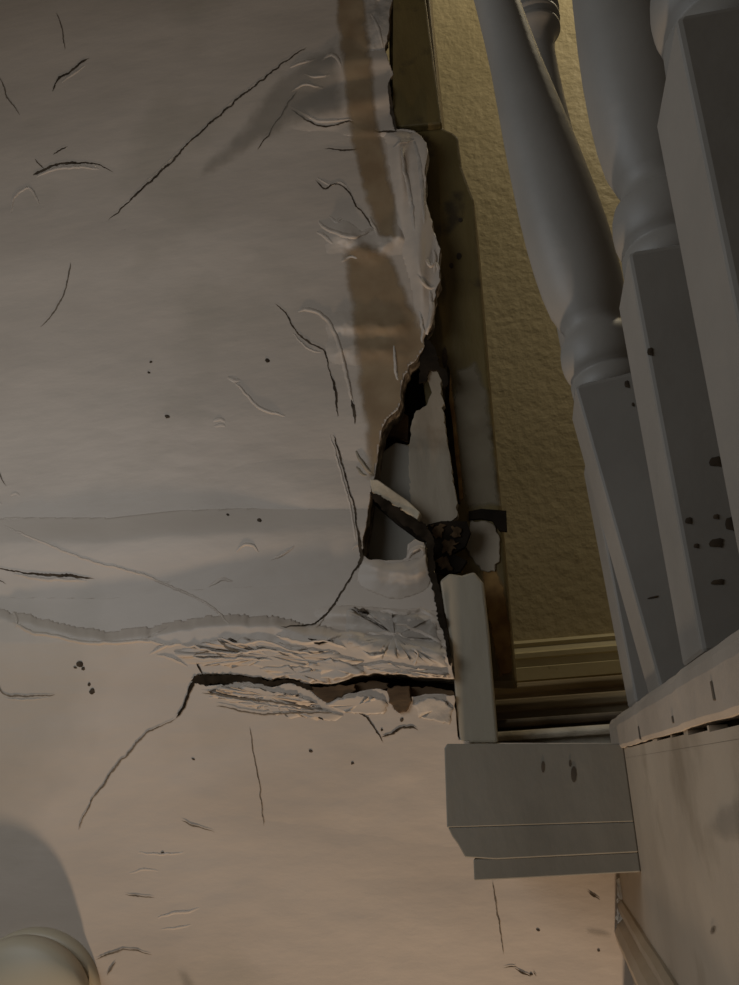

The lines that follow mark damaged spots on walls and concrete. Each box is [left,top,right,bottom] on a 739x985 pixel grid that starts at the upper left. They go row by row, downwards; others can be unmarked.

crack [109,49,304,219]
crack [259,94,355,151]
crack [377,82,397,133]
spalling [385,339,449,450]
crack [276,304,363,630]
crack [79,658,455,827]
flaking render [205,683,343,721]